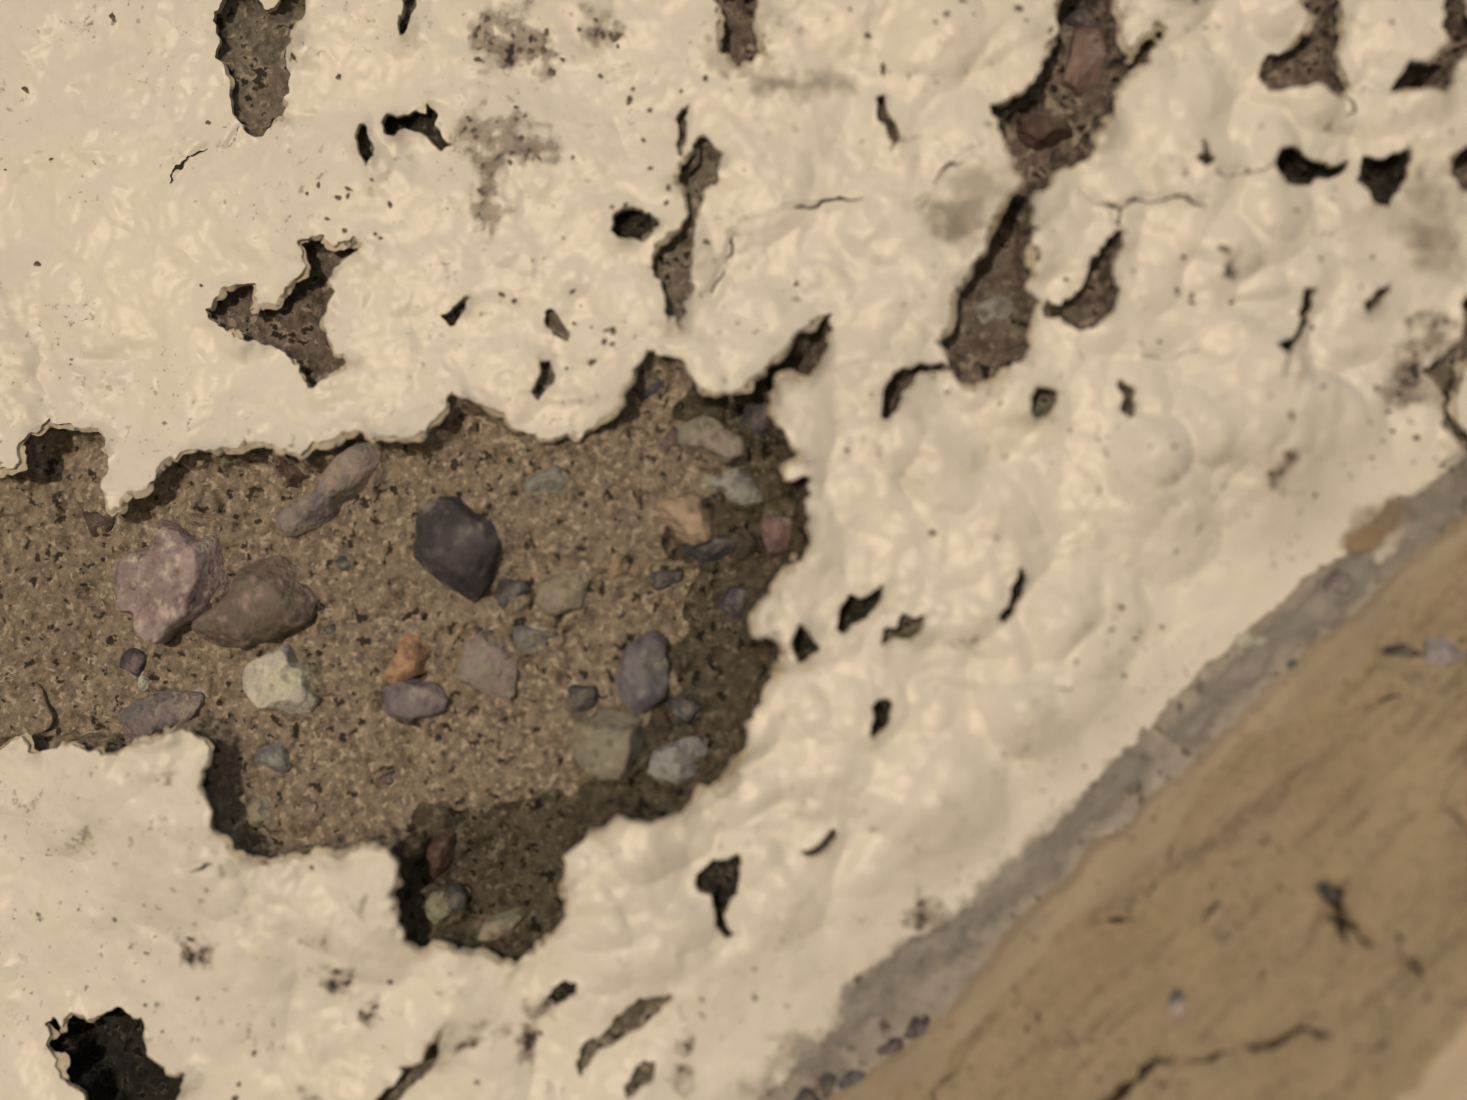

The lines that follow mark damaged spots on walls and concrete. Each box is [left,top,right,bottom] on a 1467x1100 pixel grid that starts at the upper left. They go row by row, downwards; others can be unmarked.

peeling [213,0,306,137]
peeling [1258,0,1351,100]
peeling [1390,0,1467,94]
peeling [880,0,1168,420]
peeling [1275,145,1413,207]
peeling [0,103,838,966]
peeling [757,283,1467,1100]
peeling [45,1007,187,1100]
peeling [375,1022,478,1100]
peeling [504,980,577,1059]
peeling [576,994,672,1076]
crack [1105,1003,1390,1100]